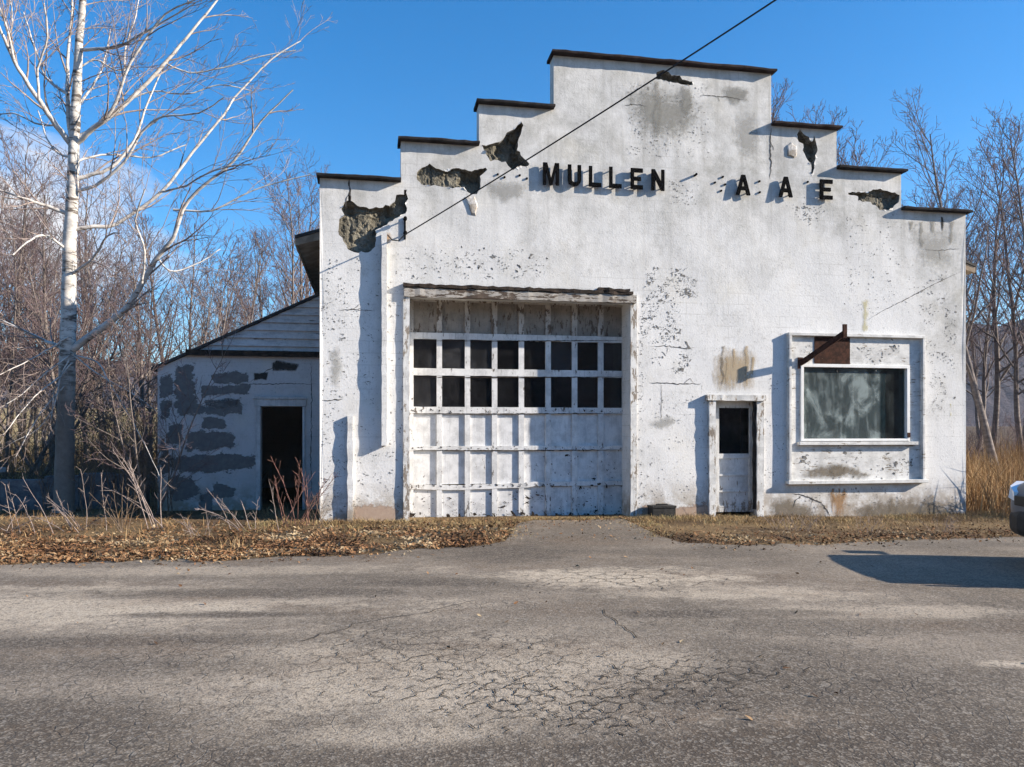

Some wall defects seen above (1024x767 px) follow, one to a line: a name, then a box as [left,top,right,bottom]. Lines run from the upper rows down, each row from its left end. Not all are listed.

spalling [417,120,529,194]
leakage [632,84,696,137]
spalling [627,70,709,157]
spalling [796,130,818,175]
spalling [338,187,408,271]
spalling [844,188,910,312]
crack [871,249,957,318]
peeling [637,266,705,422]
rust [717,346,754,387]
crack [167,629,885,744]